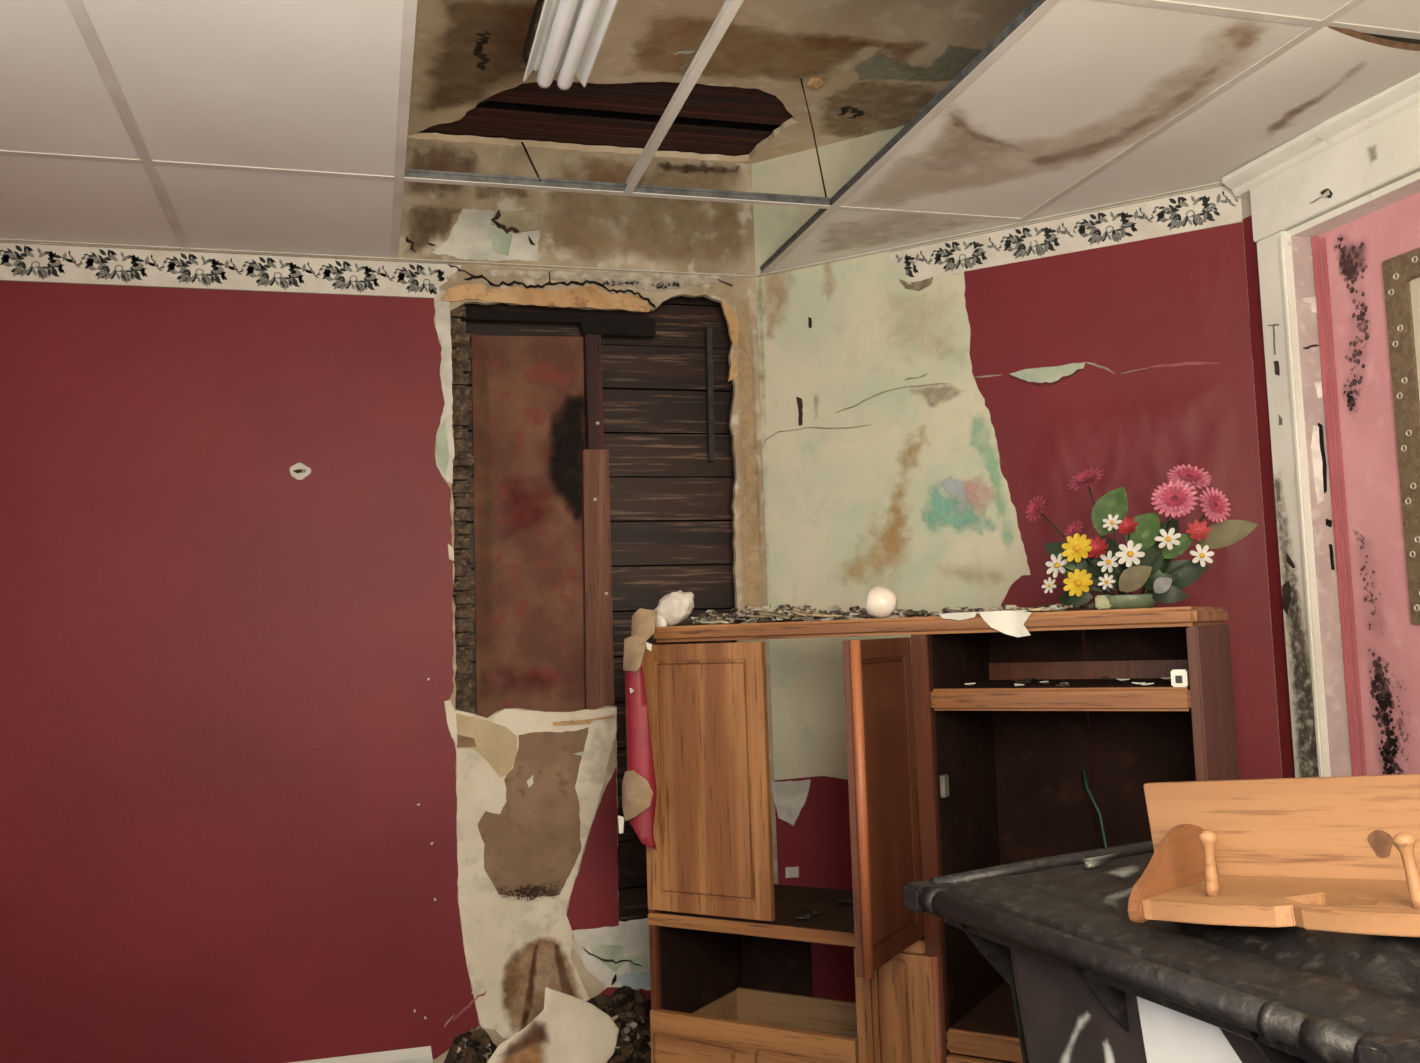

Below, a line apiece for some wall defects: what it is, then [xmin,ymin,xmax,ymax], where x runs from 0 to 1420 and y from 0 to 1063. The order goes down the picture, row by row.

crack [673,45,701,82]
peeling [406,209,542,262]
crack [448,264,656,308]
peeling [899,277,933,291]
peeling [928,460,1002,528]
damp [1360,538,1381,630]
damp [1278,512,1319,778]
mould [1369,650,1408,775]
spalling [573,918,651,990]